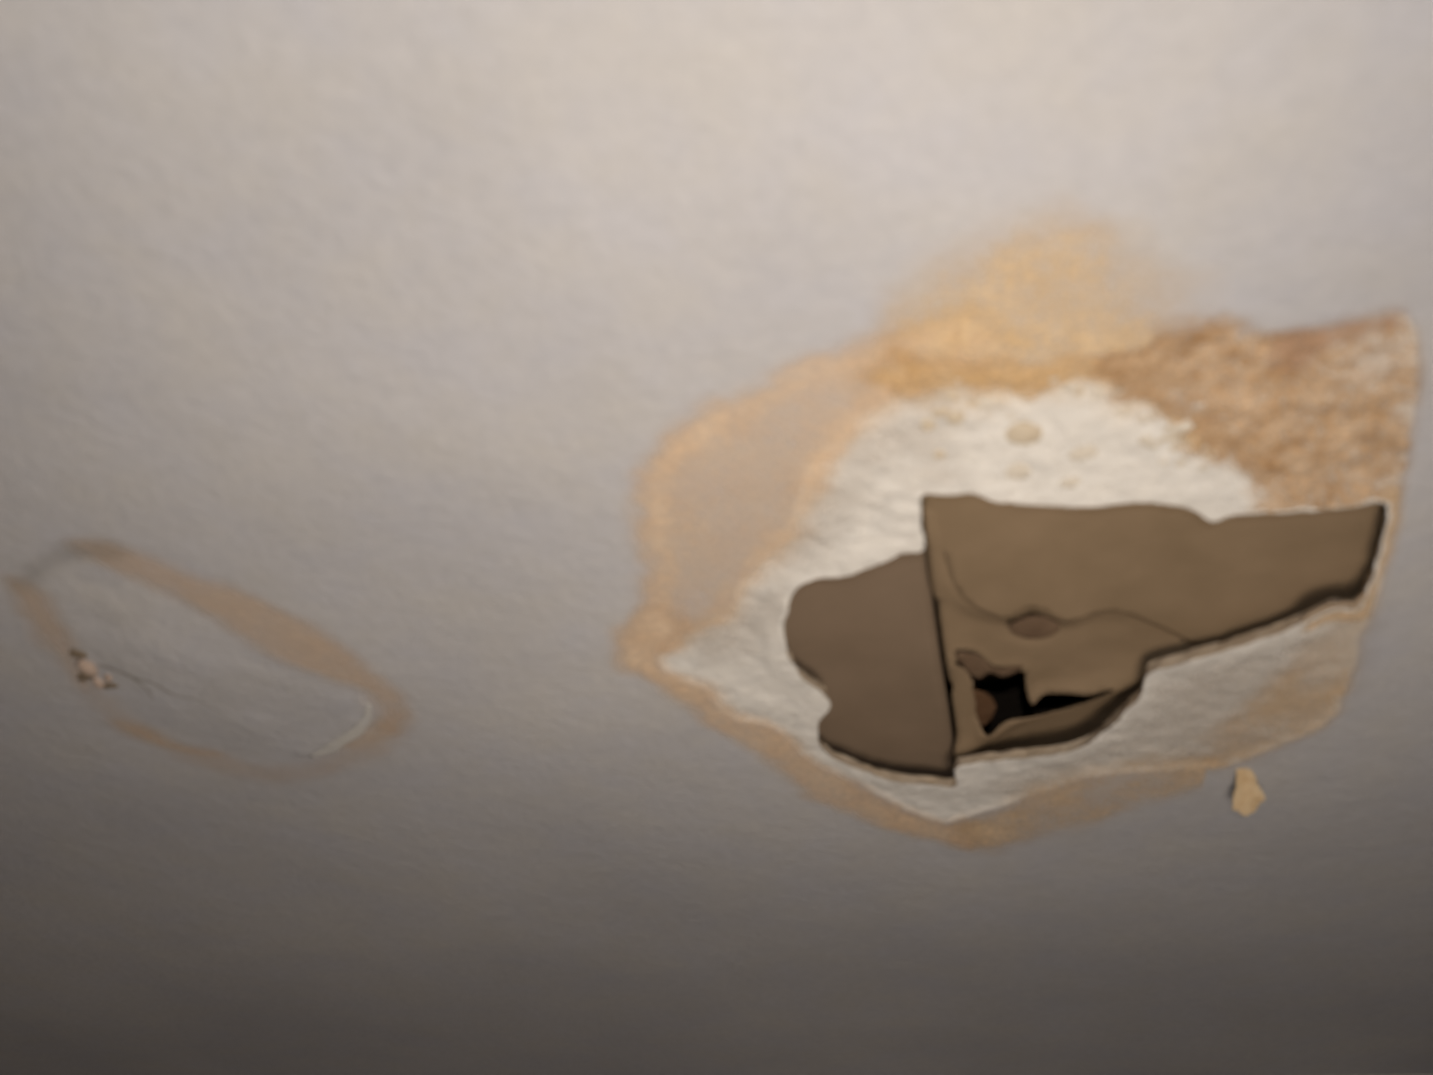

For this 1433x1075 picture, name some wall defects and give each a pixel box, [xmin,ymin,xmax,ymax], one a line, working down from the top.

damp [618,234,1419,847]
flaking render [656,313,1418,822]